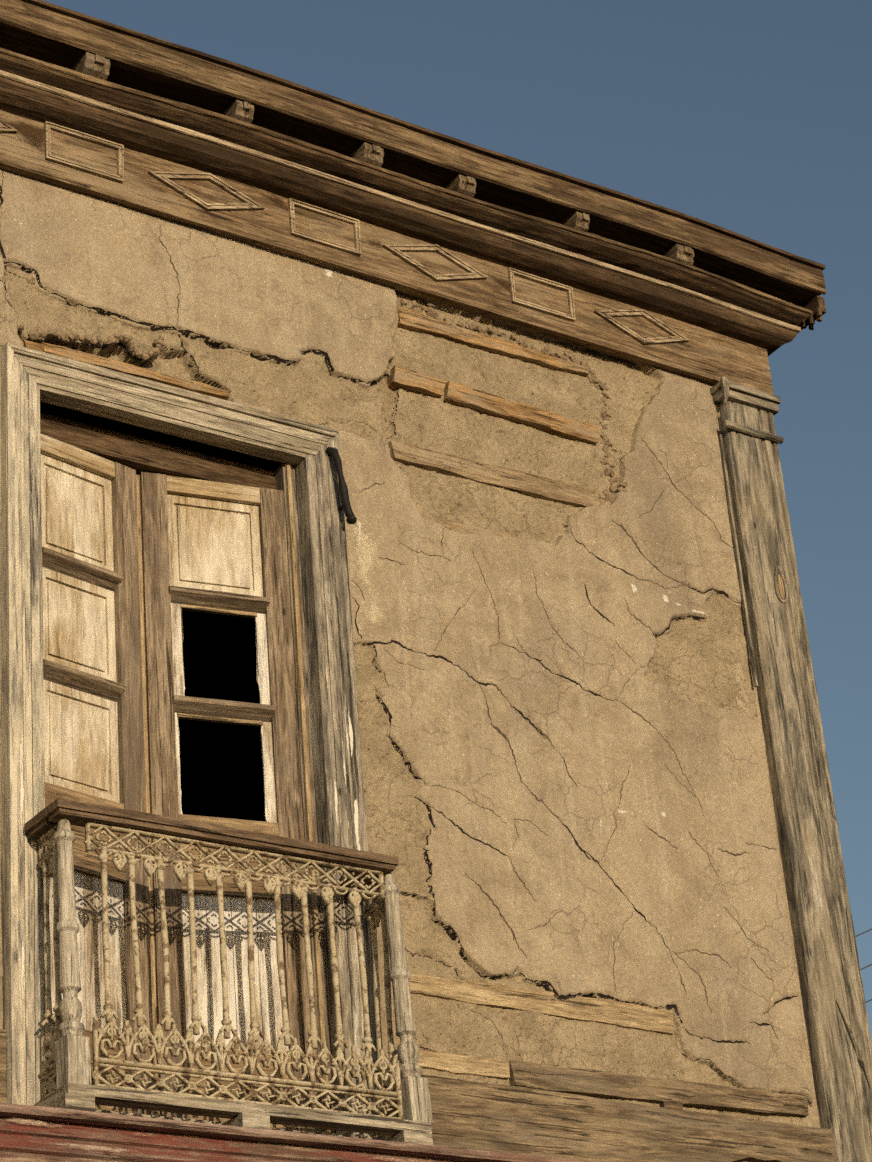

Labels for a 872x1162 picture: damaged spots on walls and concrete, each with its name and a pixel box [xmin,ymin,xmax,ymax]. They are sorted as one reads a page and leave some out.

crack [0,230,383,391]
spalling [4,264,660,546]
spalling [334,642,742,1089]
crack [352,439,797,1088]
spalling [683,1106,813,1127]